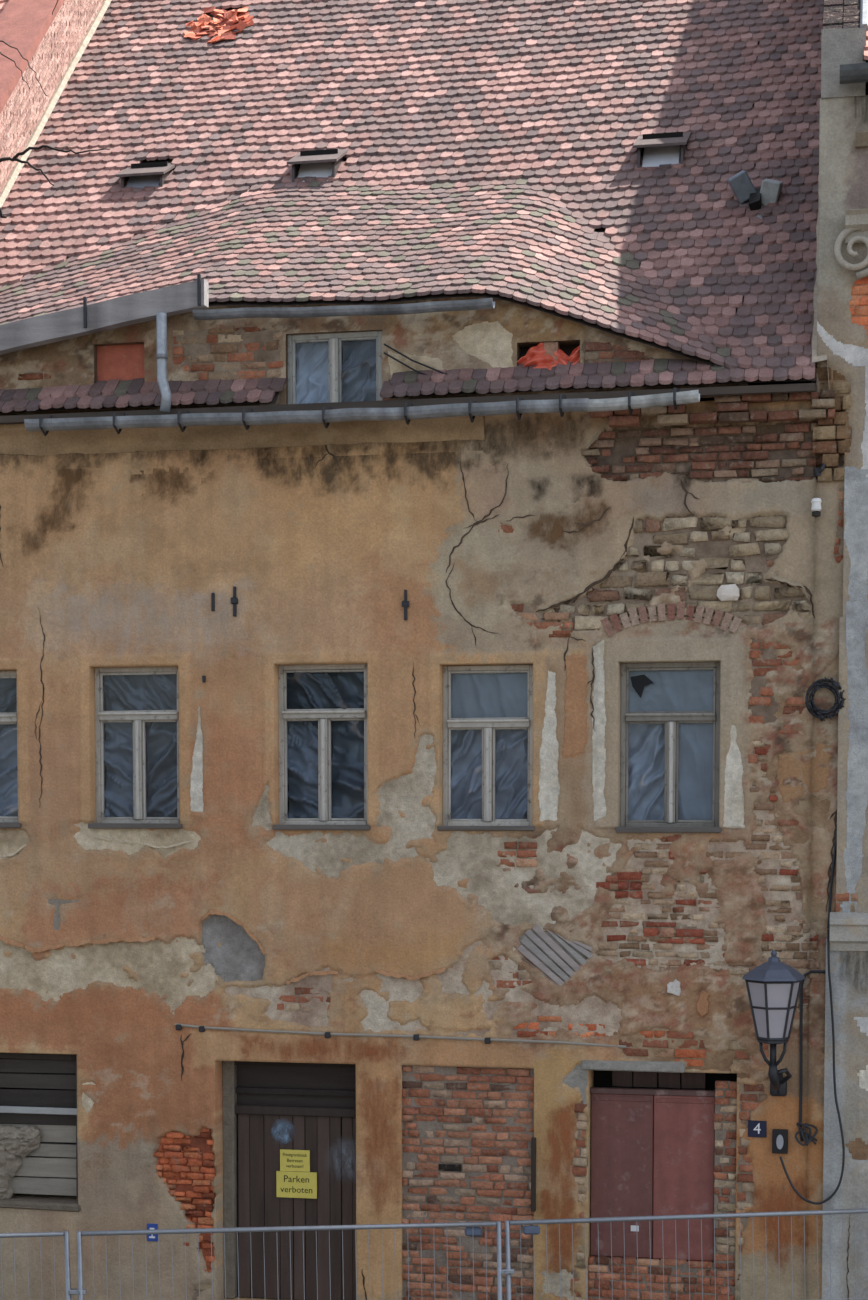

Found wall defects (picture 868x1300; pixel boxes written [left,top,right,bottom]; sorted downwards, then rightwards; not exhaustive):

spalling [184,6,254,44]
flaking render [581,340,655,364]
water stain [26,453,118,549]
water stain [131,450,188,497]
flaking render [581,365,852,563]
crack [445,461,729,728]
crack [35,608,45,802]
flaking render [0,514,858,1252]
peeling [854,1017,868,1036]
peeling [857,1065,868,1091]
flaking render [154,1127,216,1300]